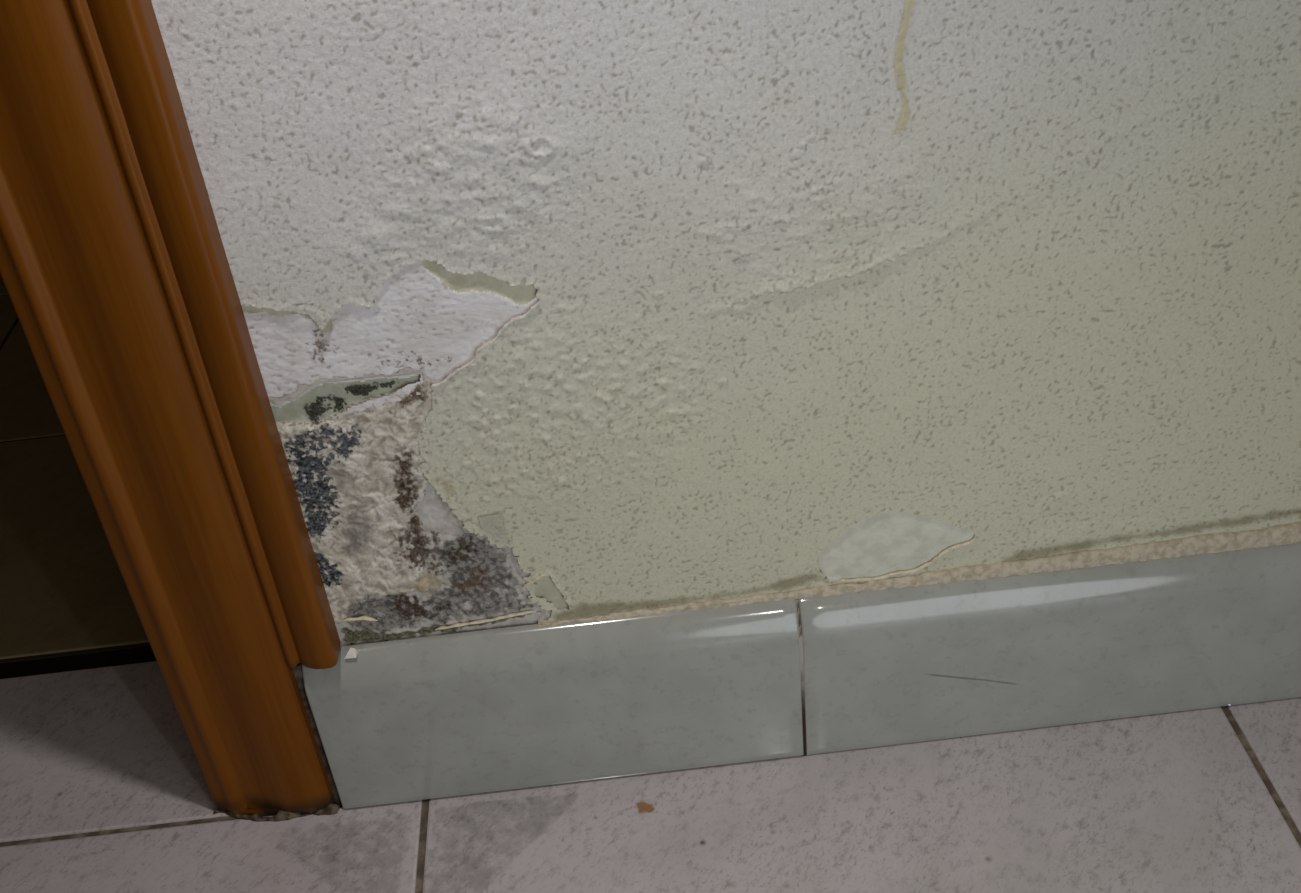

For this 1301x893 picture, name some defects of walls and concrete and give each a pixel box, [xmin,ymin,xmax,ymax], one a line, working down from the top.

leakage [306,329,336,362]
leakage [284,351,452,588]
spalling [239,253,576,647]
leakage [342,448,541,645]